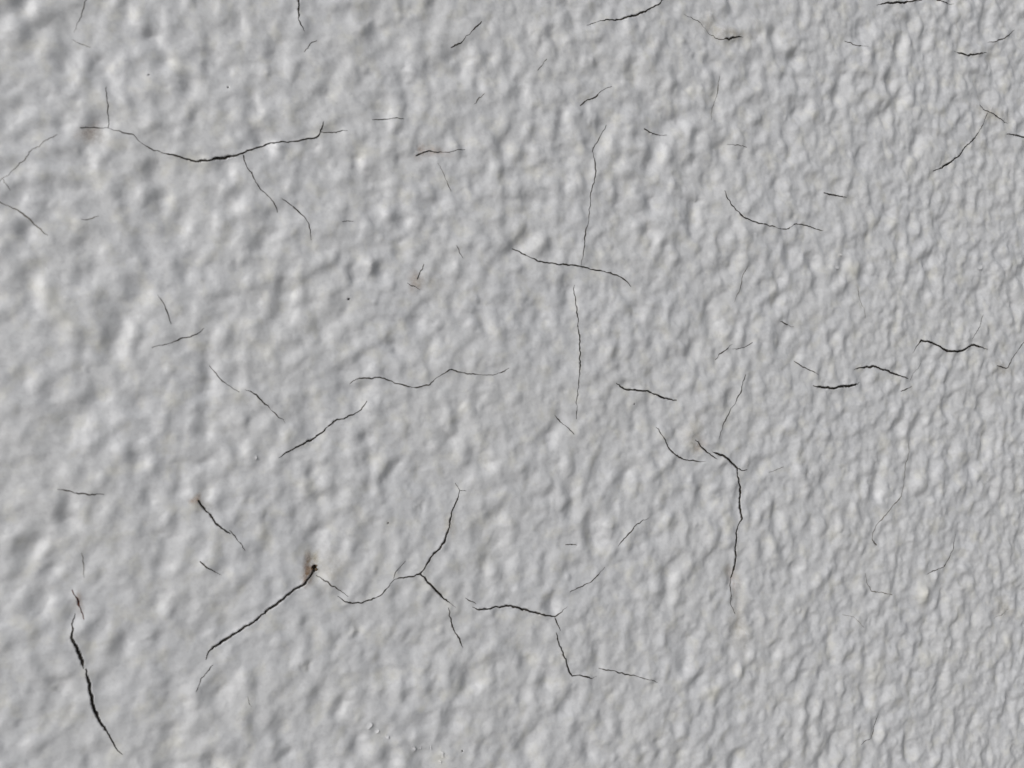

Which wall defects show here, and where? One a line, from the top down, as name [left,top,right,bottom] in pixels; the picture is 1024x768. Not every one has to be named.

crack [589,0,662,25]
crack [0,89,347,235]
crack [934,105,1024,171]
crack [725,191,822,231]
crack [513,126,630,434]
crack [279,368,509,458]
crack [616,383,677,401]
crack [794,316,1024,391]
crack [656,374,747,613]
crack [196,483,658,691]
crack [70,553,122,754]